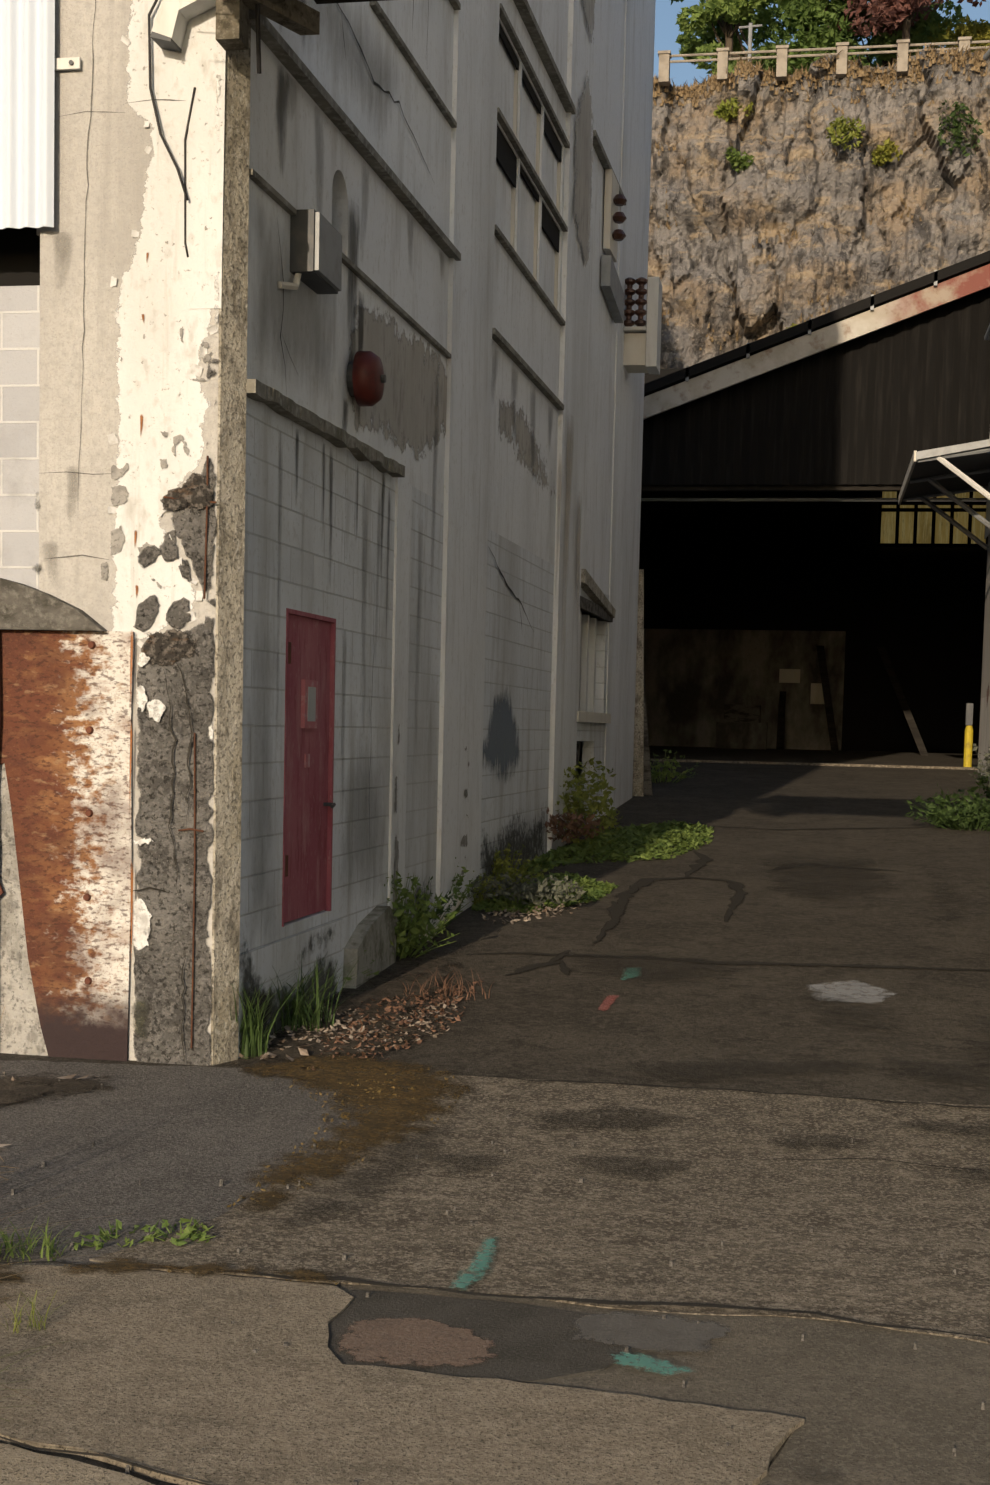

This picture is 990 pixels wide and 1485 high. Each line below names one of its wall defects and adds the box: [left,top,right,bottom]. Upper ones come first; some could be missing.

crack [49,0,184,483]
peeling [180,271,219,381]
leakage [349,215,363,351]
spalling [101,431,217,1066]